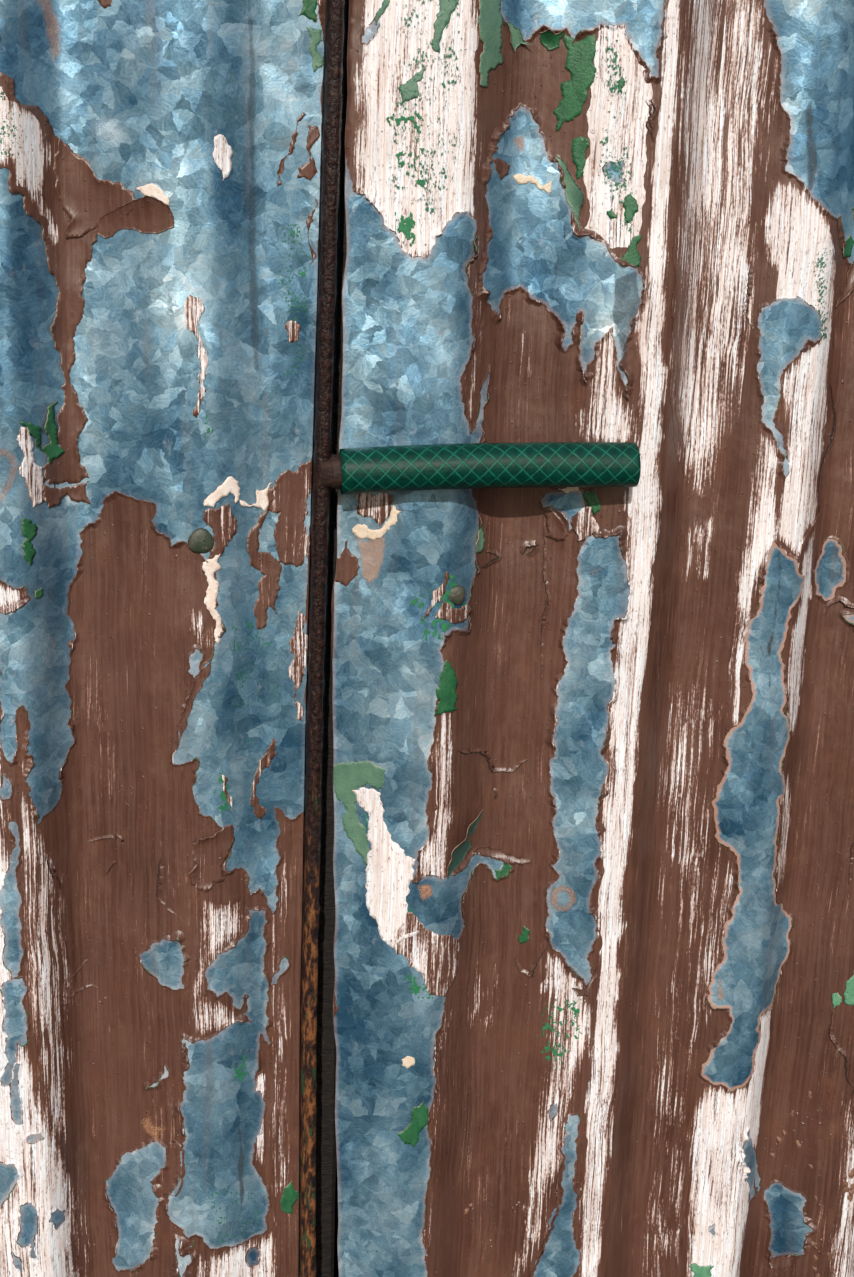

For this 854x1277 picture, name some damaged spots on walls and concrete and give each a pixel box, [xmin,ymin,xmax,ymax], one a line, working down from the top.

peeling [0,0,325,1277]
peeling [332,0,854,1277]